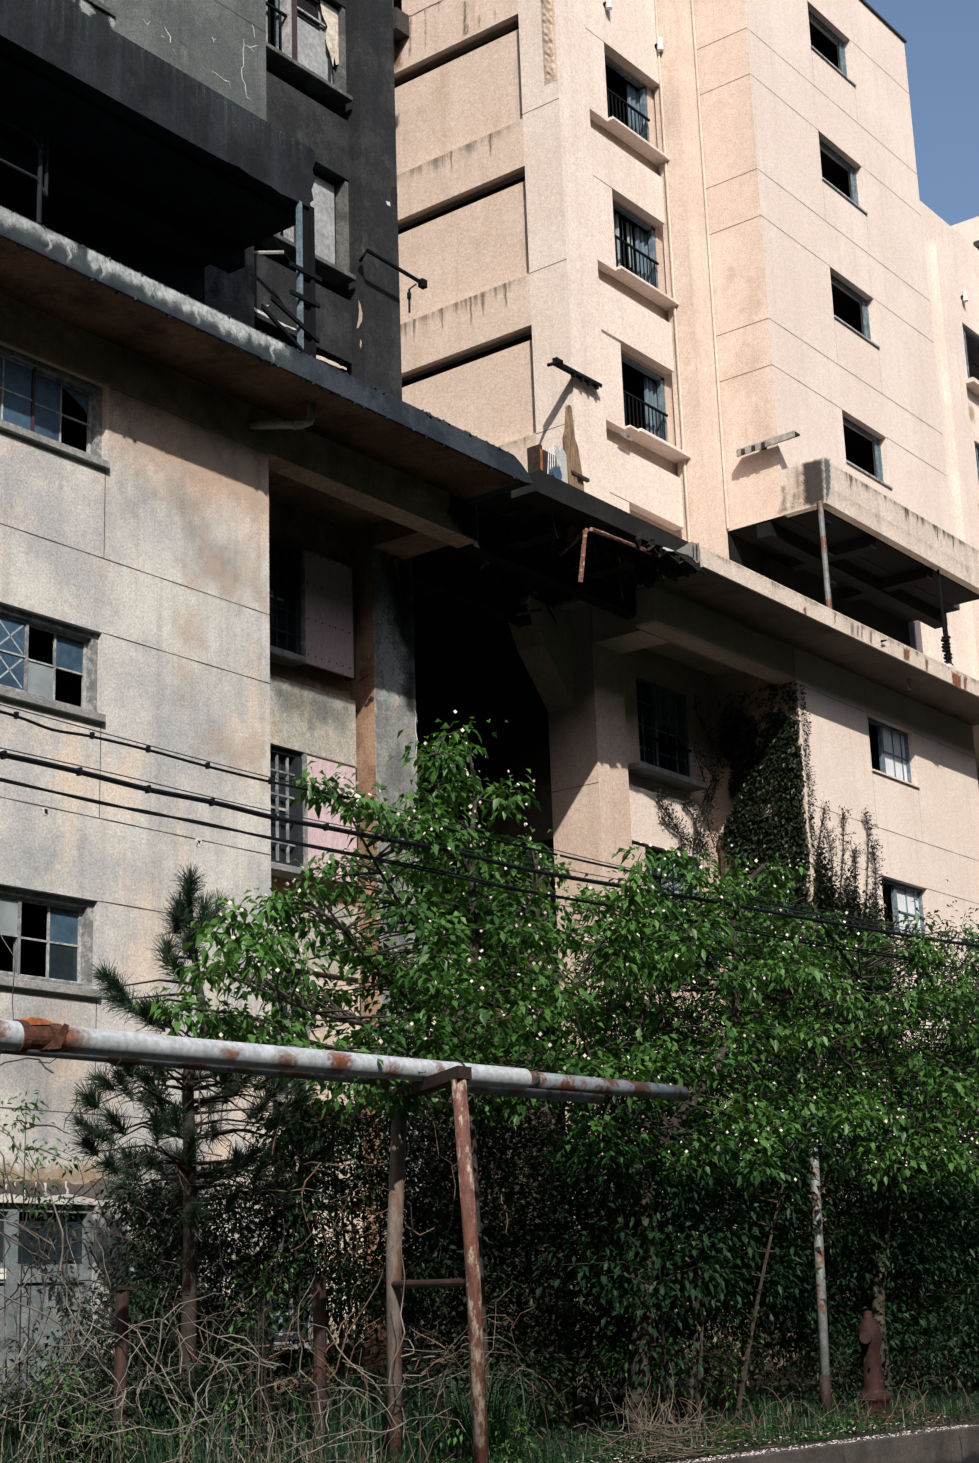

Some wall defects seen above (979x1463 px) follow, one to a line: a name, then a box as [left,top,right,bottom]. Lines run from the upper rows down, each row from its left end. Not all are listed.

damp [0,207,285,354]
corrosion [952,672,967,689]
corrosion [328,1052,352,1073]